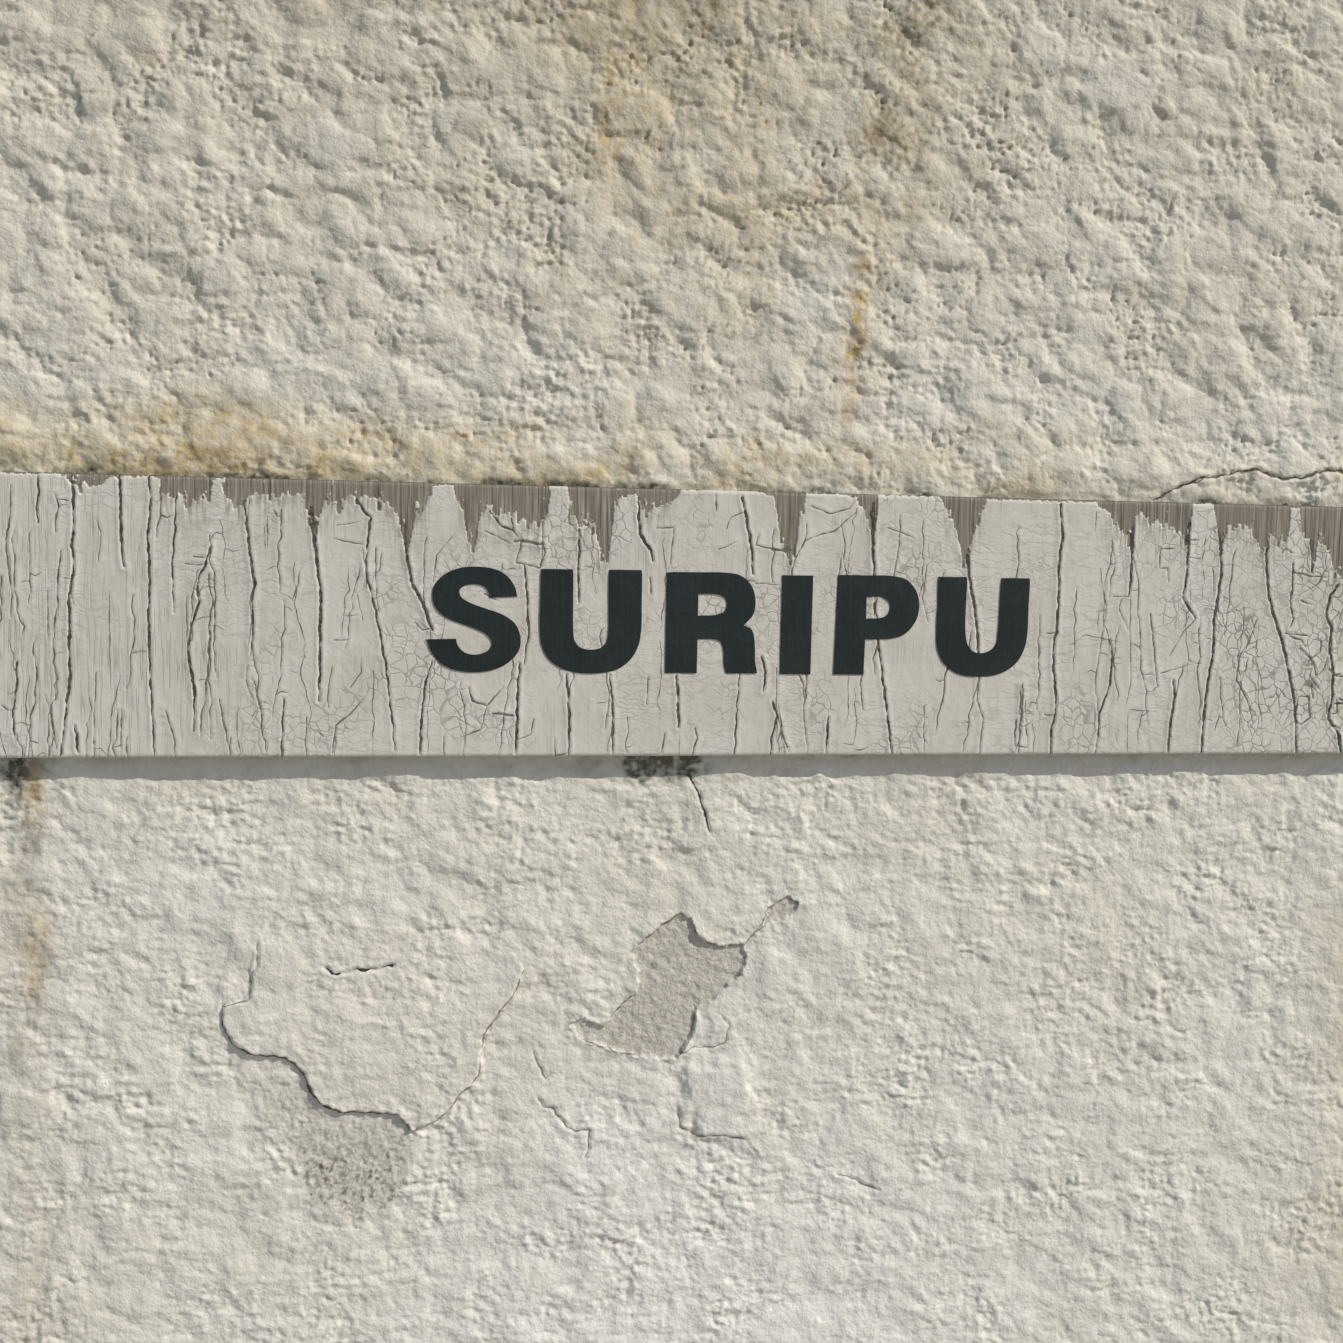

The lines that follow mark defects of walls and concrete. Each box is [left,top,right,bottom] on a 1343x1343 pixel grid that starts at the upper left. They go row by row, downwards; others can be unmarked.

damp [0,0,1343,507]
crack [1153,468,1343,500]
crack [688,774,710,832]
damp [0,754,1343,1343]
spalling [569,895,801,1061]